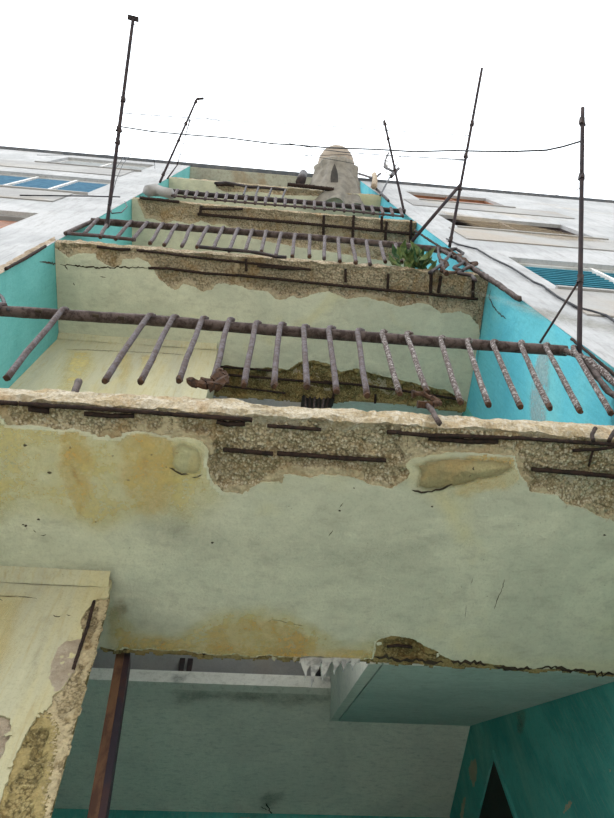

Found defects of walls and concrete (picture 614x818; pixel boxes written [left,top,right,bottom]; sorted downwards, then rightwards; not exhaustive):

crack [39,261,144,285]
spalling [0,196,497,332]
spalling [0,400,614,523]
spalling [0,598,614,818]